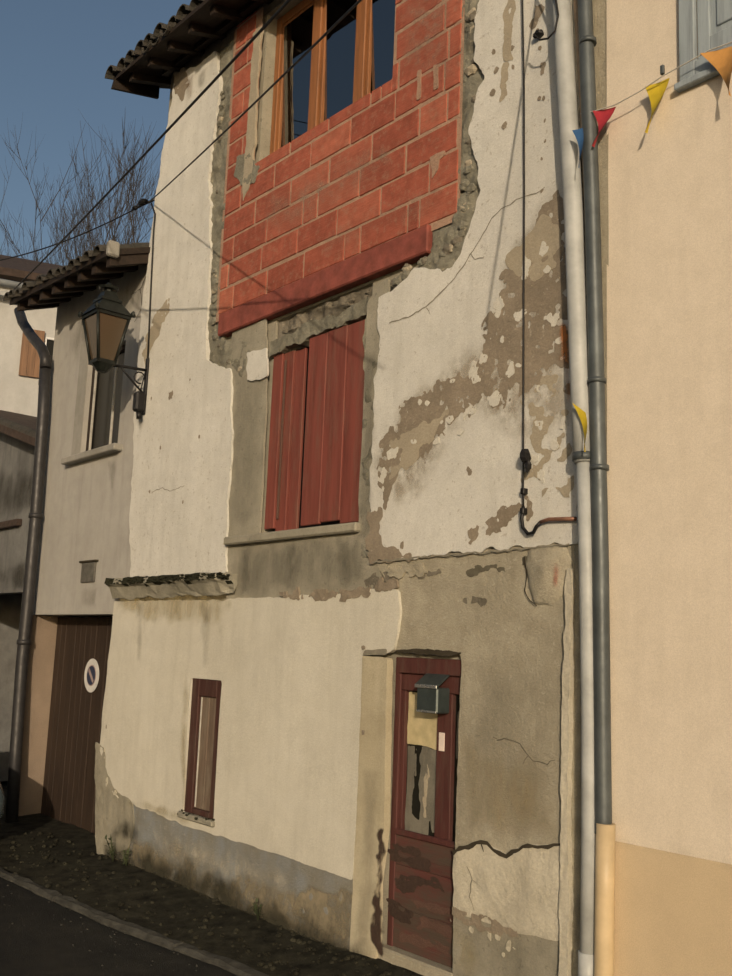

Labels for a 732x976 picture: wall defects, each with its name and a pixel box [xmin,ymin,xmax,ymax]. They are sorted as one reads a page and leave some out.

flaking render [529,4,545,30]
flaking render [390,0,516,286]
flaking render [208,40,269,381]
crack [389,187,545,324]
peeling [279,189,574,602]
spalling [361,645,387,655]
spalling [463,596,487,607]
crack [493,737,554,765]
leakage [105,849,354,953]
flaking render [386,843,519,958]
crack [452,840,560,909]